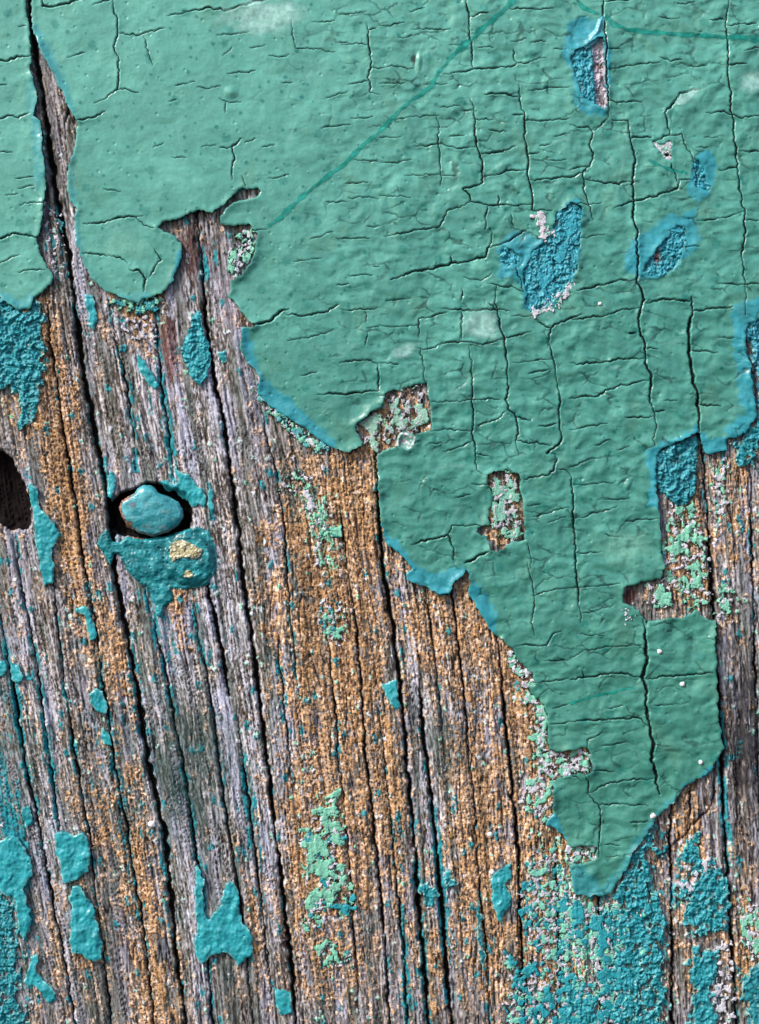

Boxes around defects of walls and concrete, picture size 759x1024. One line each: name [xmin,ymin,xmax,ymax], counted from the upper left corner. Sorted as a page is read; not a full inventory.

peeling [500,202,582,319]
peeling [356,384,429,453]
crack [0,0,264,1024]
crack [154,0,759,1024]
peeling [490,470,526,545]
peeling [643,454,740,623]
peeling [506,643,592,823]
peeling [54,830,104,961]
peeling [194,864,253,966]
peeling [298,788,358,971]
peeling [490,842,642,1024]
peeling [712,897,759,1024]